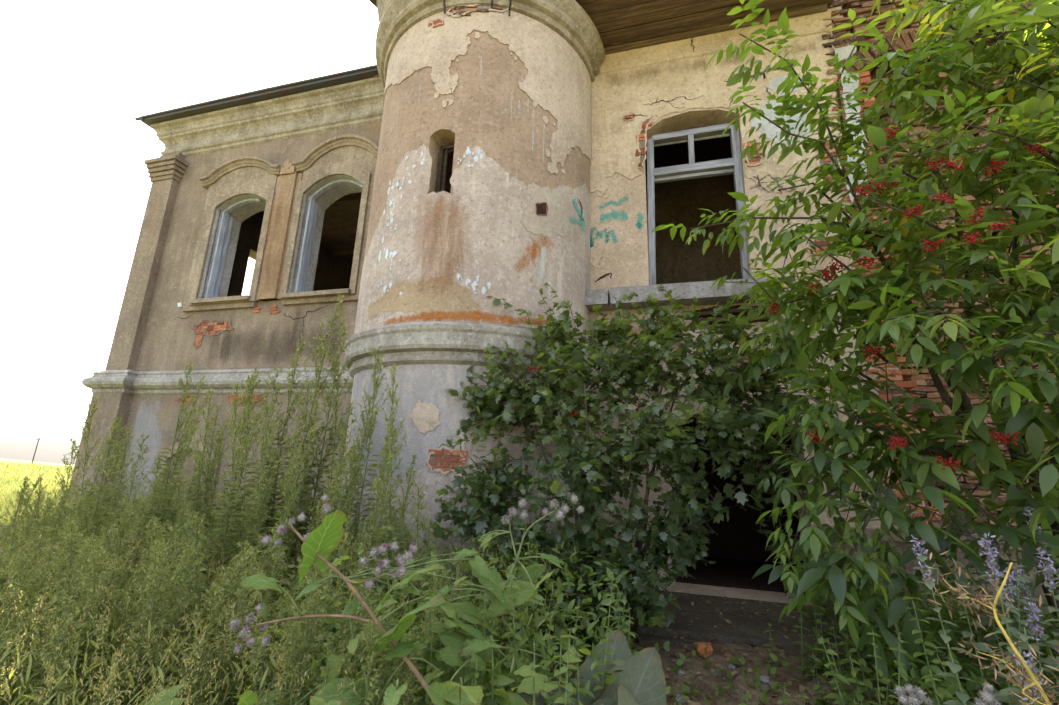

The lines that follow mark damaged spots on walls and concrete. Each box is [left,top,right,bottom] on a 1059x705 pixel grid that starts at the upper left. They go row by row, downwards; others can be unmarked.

crack [630,96,702,116]
flaking render [354,4,842,346]
spalling [191,320,234,350]
flaking render [408,399,441,434]
spalling [426,445,468,475]